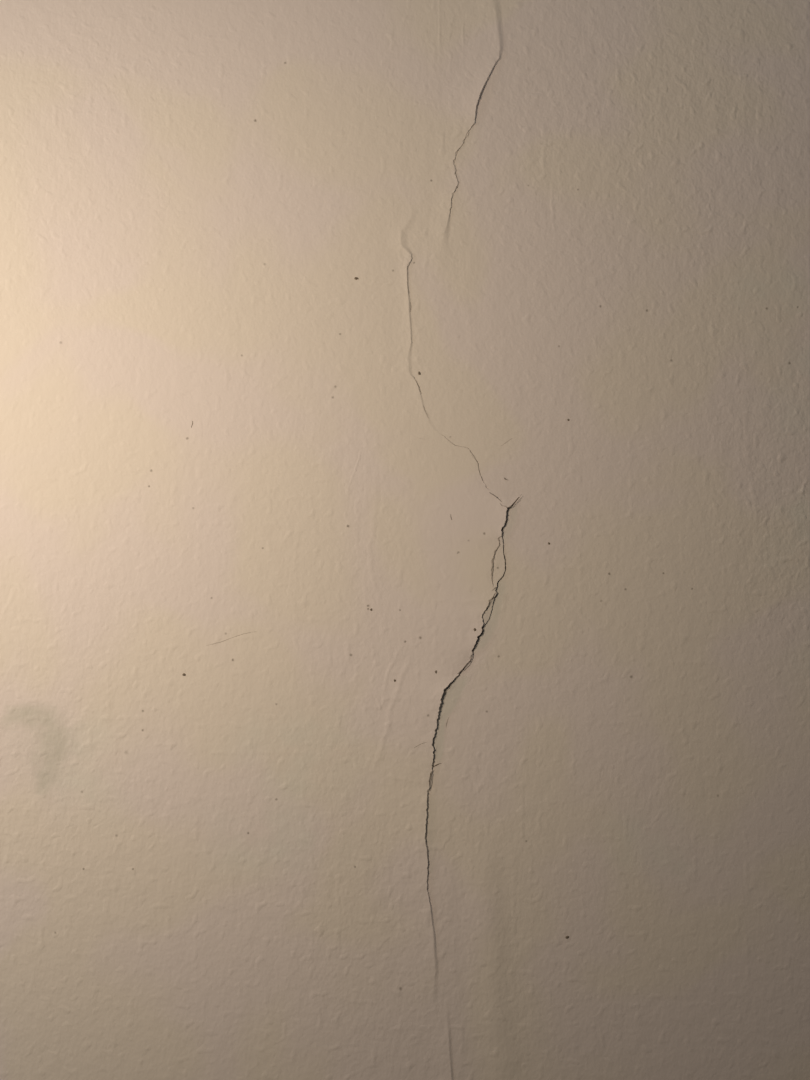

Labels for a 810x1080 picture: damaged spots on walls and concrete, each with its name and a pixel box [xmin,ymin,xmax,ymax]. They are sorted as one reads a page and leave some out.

peeling [337,437,521,1021]